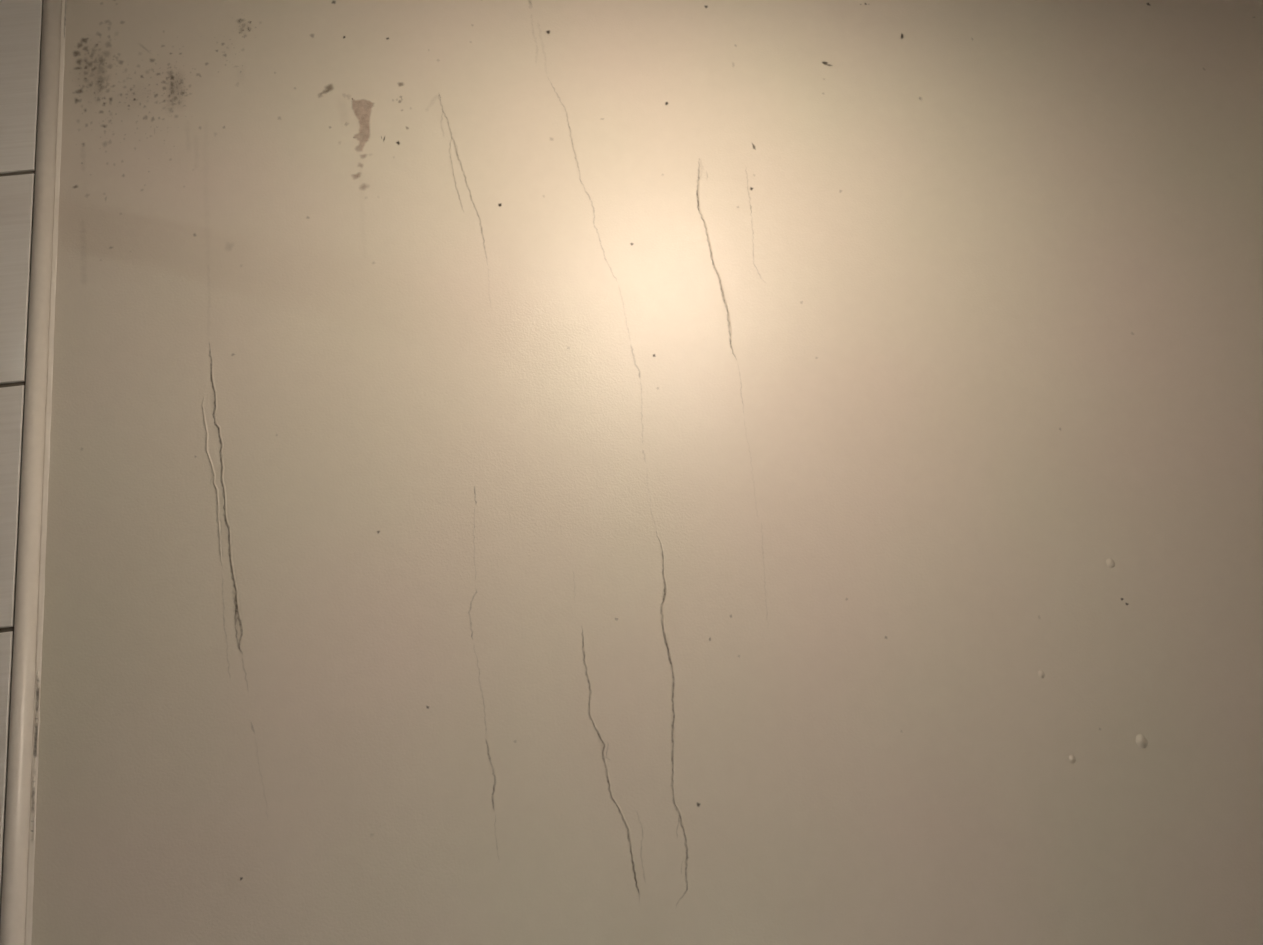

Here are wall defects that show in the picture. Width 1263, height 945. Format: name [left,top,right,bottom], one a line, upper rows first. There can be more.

crack [698,158,739,361]
crack [583,624,642,904]
crack [656,529,690,911]